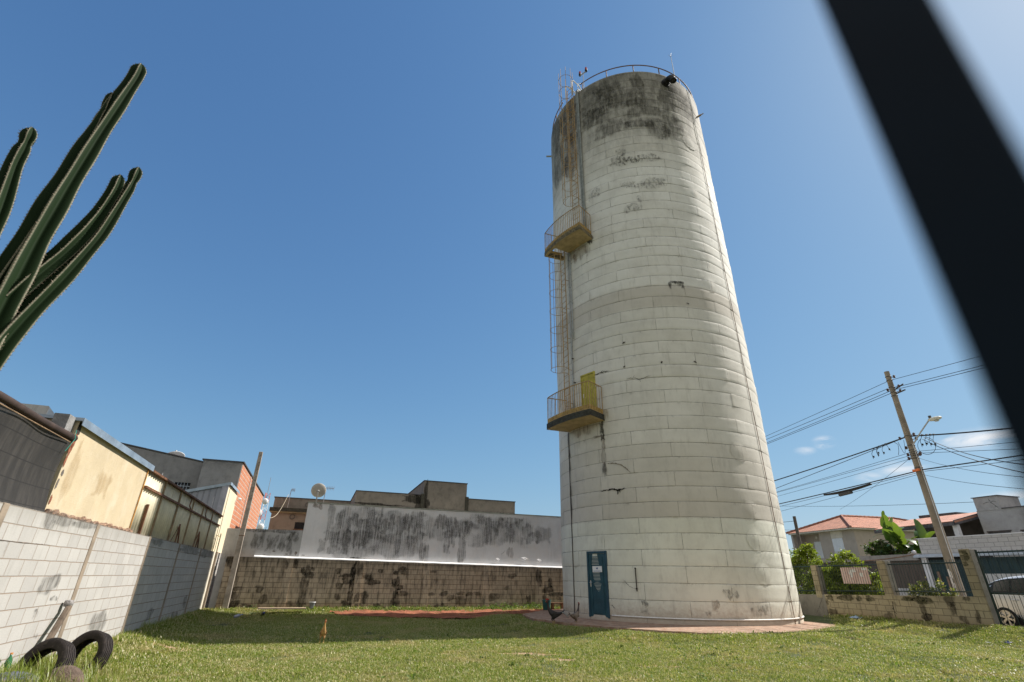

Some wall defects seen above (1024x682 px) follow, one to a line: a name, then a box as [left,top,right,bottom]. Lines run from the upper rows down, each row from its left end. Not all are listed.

damp [340,479,430,559]
damp [251,530,314,607]
damp [335,561,408,608]